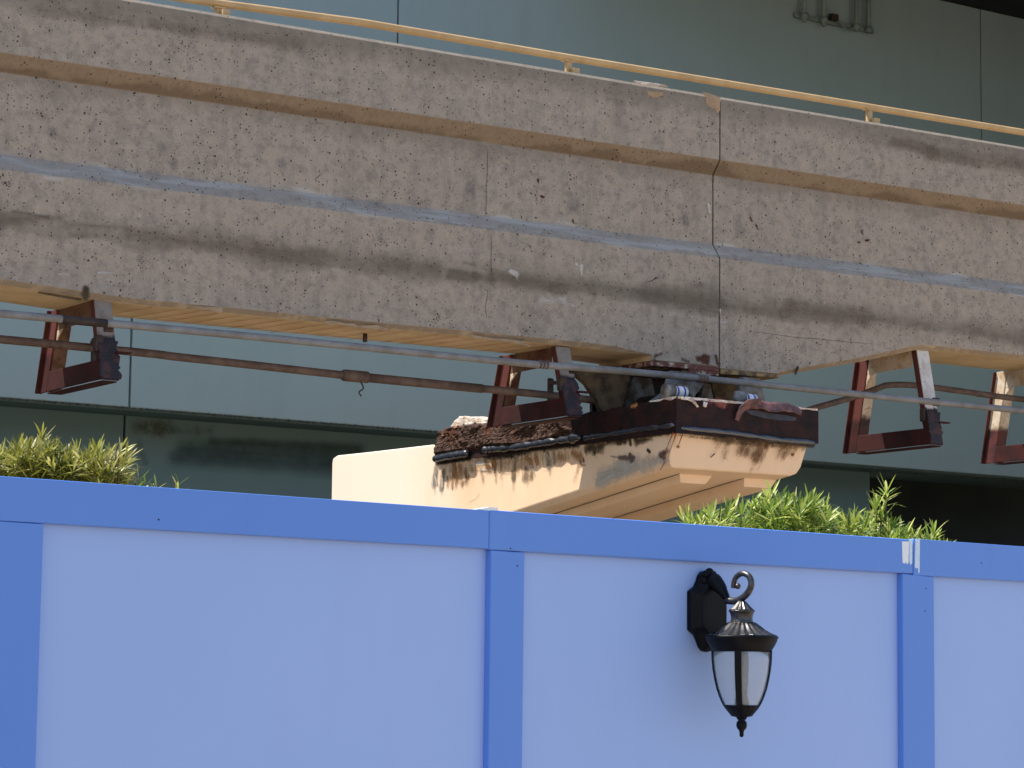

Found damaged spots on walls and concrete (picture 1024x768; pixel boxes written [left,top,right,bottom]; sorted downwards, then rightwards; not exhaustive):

corrosion [432,421,584,491]
leakage [484,434,804,463]
corrosion [726,441,767,464]